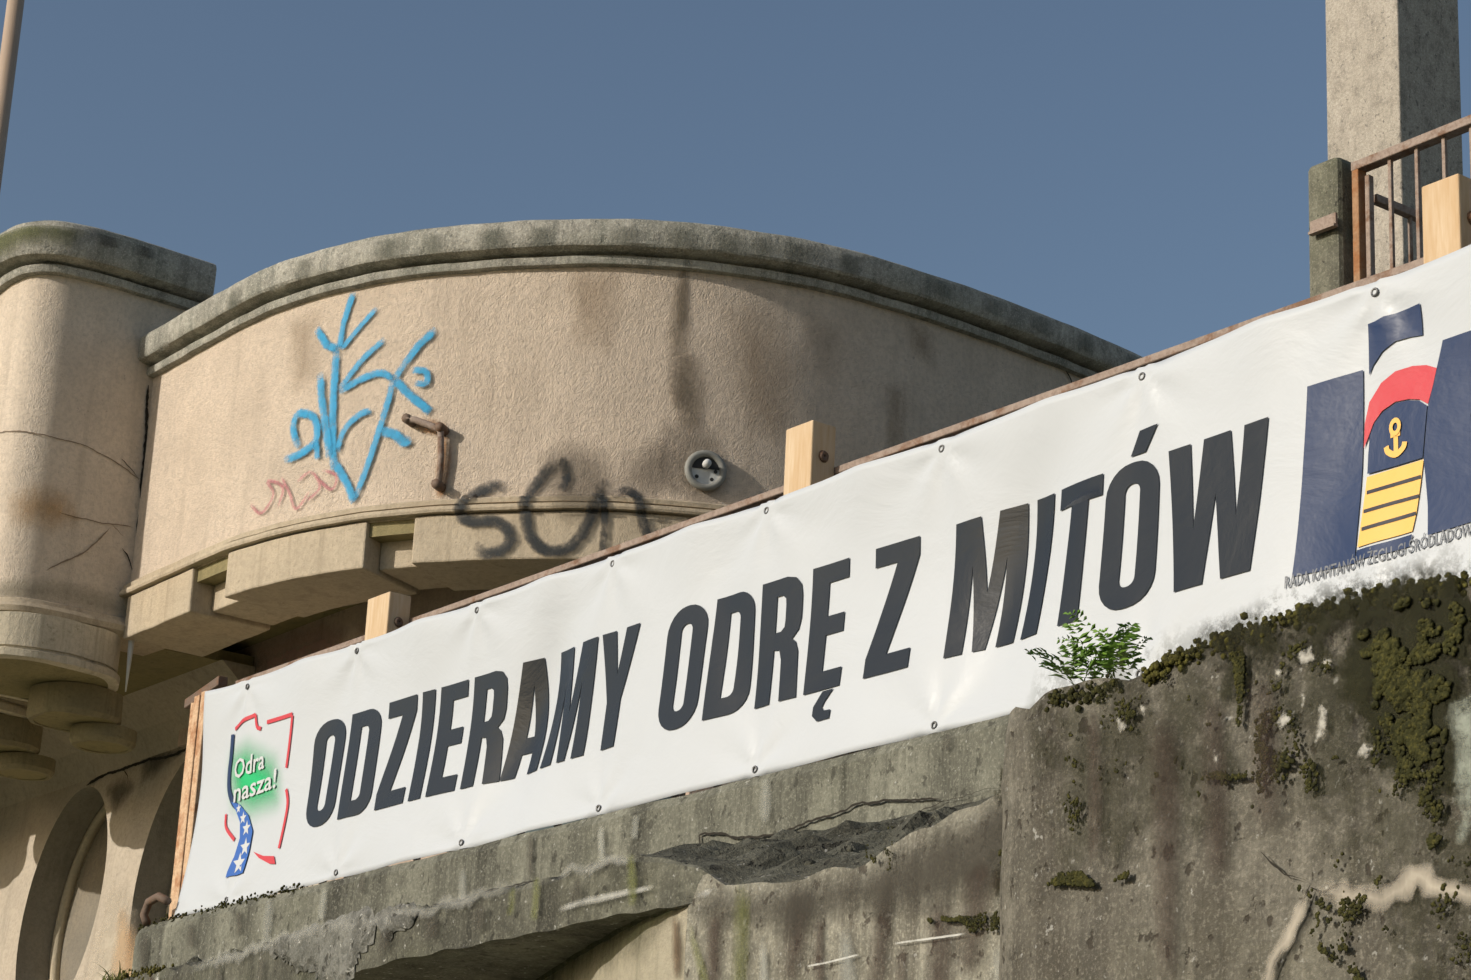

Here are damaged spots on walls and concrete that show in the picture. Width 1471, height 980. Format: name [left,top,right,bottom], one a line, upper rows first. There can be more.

crack [0,385,149,571]
crack [699,787,1001,843]
water stain [708,803,1003,980]
water stain [1455,701,1471,837]